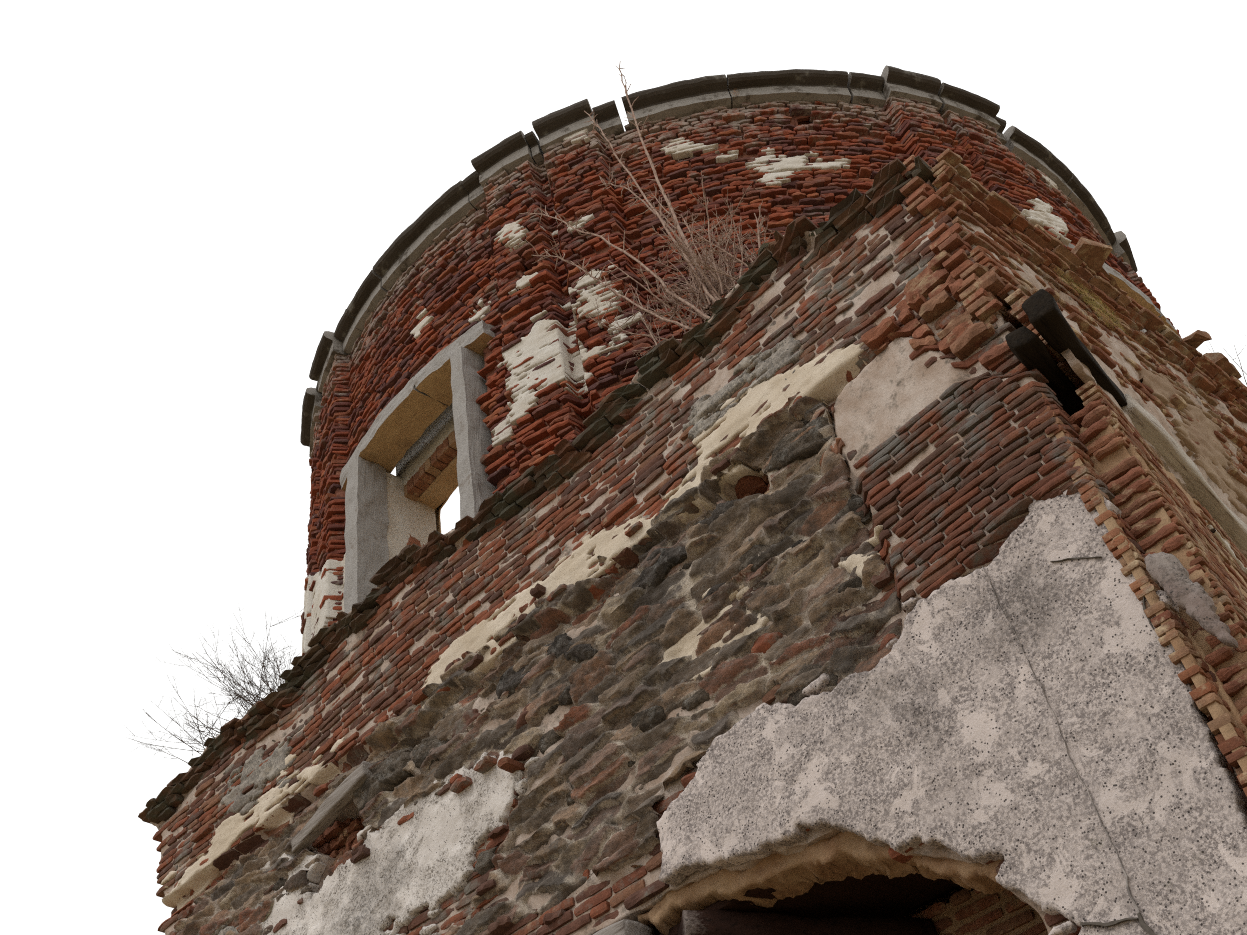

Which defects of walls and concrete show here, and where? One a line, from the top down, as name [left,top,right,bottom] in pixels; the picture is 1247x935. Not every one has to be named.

flaking render [494,214,594,255]
flaking render [563,129,591,146]
flaking render [659,137,851,186]
flaking render [410,308,434,339]
flaking render [417,265,1011,708]
crack [1050,555,1102,563]
flaking render [1137,365,1247,516]
flaking render [656,489,1247,935]
crack [982,566,1157,935]
flaking render [215,751,540,935]